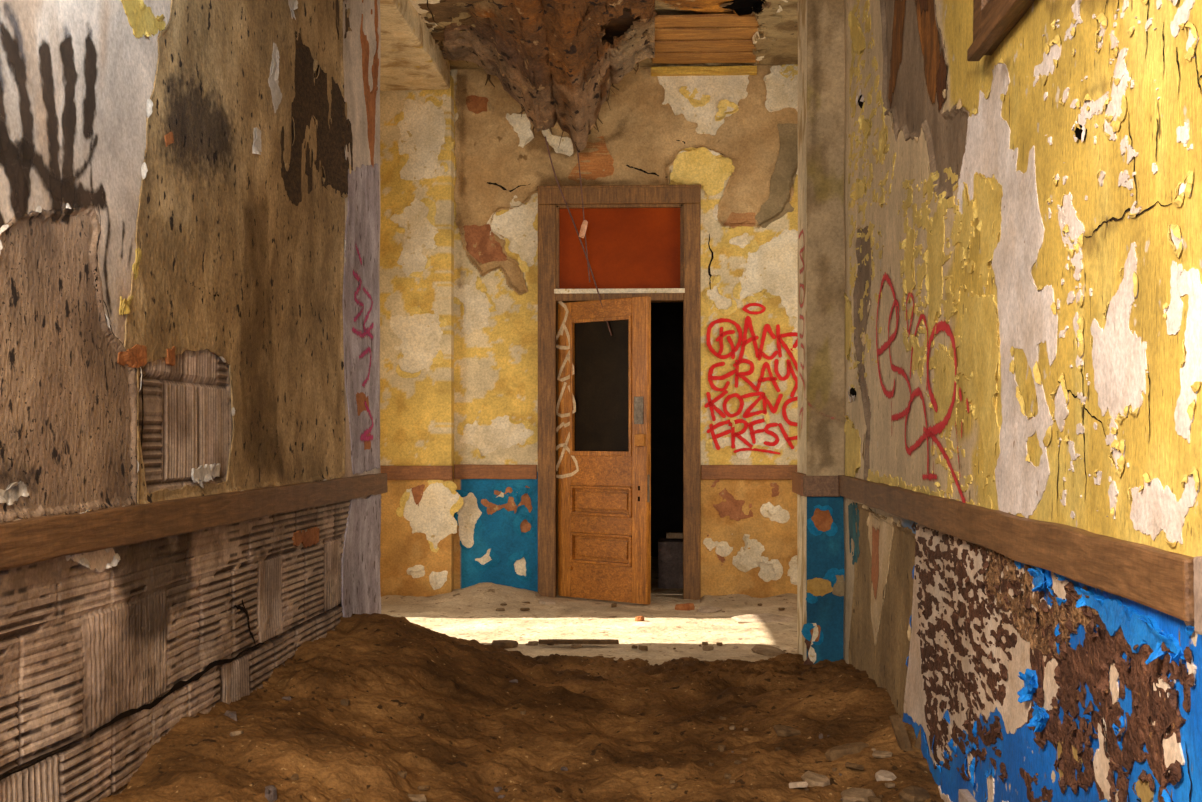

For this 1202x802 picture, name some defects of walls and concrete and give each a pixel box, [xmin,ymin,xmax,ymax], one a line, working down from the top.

crack [1084,0,1202,238]
peeling [844,0,1202,548]
crack [0,600,264,781]
flaking render [341,494,381,617]
peeling [407,565,448,590]
peeling [703,480,1197,802]